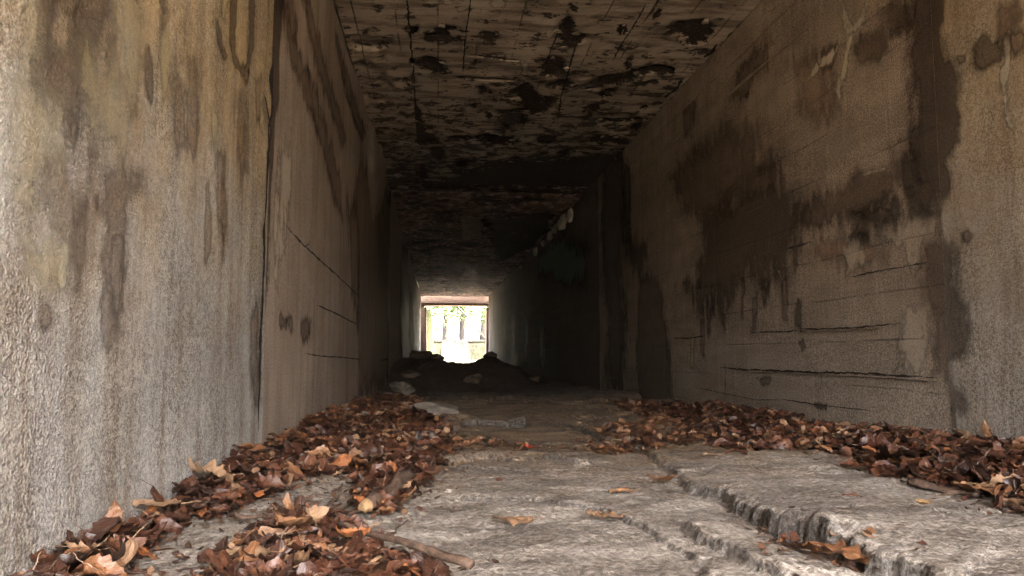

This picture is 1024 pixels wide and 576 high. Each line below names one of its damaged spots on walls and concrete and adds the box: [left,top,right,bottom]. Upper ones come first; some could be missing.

damp [26,0,198,350]
crack [258,60,358,432]
damp [204,0,421,408]
crack [406,0,416,103]
spalling [407,2,586,163]
crack [442,0,580,119]
spalling [584,57,680,145]
spalling [662,18,717,54]
damp [674,0,1024,356]
crack [697,361,937,412]
crack [751,323,900,333]
damp [924,230,972,431]